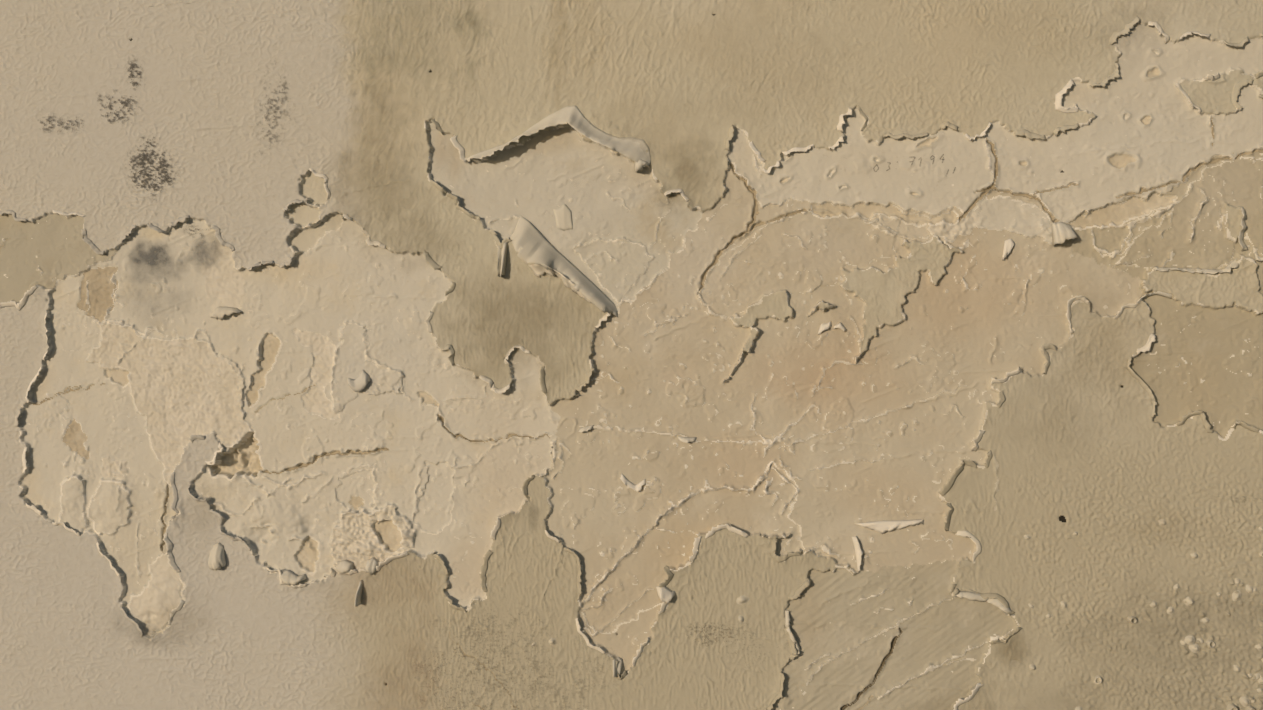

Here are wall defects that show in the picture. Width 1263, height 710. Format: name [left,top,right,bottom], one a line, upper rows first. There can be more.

water stain [104,64,141,122]
mould [130,139,172,191]
crack [697,164,813,295]
peeling [0,168,561,641]
peeling [424,16,1263,710]